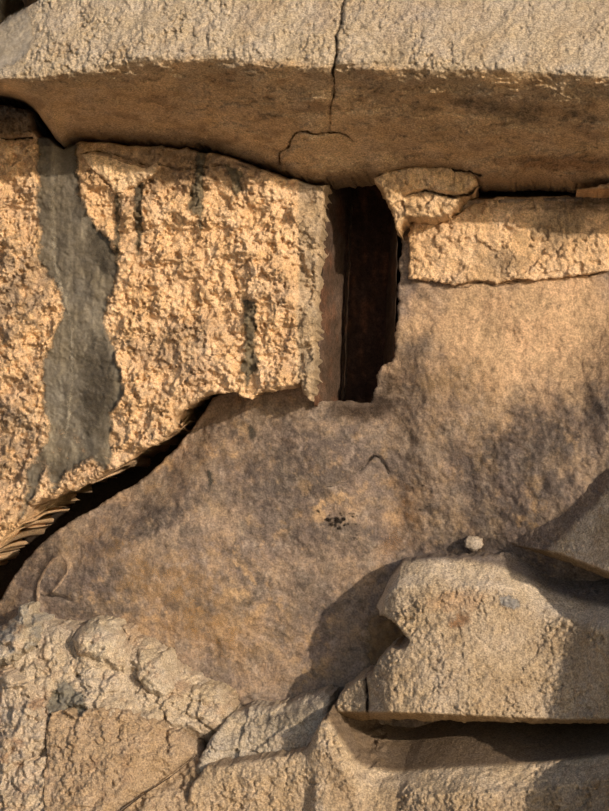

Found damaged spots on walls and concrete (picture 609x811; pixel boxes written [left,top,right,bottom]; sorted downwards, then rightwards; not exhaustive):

crack [331,0,345,100]
leakage [134,182,144,255]
leakage [188,151,207,233]
leakage [225,165,243,196]
crack [278,130,349,165]
leakage [16,136,124,524]
leakage [241,300,260,386]
spalling [0,667,48,811]